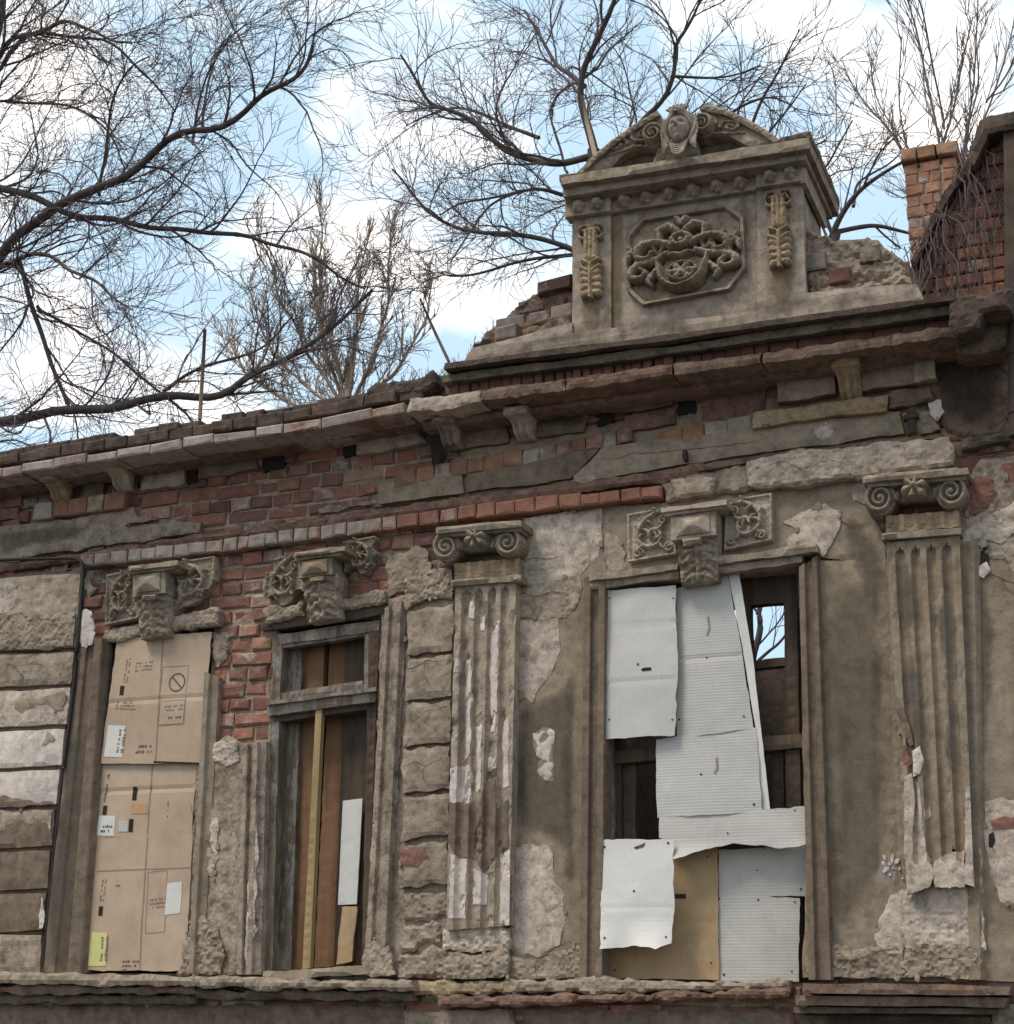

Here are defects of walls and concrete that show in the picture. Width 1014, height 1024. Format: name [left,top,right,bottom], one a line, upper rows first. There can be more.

spalling [806,227,918,293]
spalling [393,568,454,806]
peeling [519,508,626,703]
peeling [784,502,841,557]
peeling [960,462,1014,579]
peeling [434,601,580,980]
spalling [832,696,1014,983]
spalling [178,912,227,976]